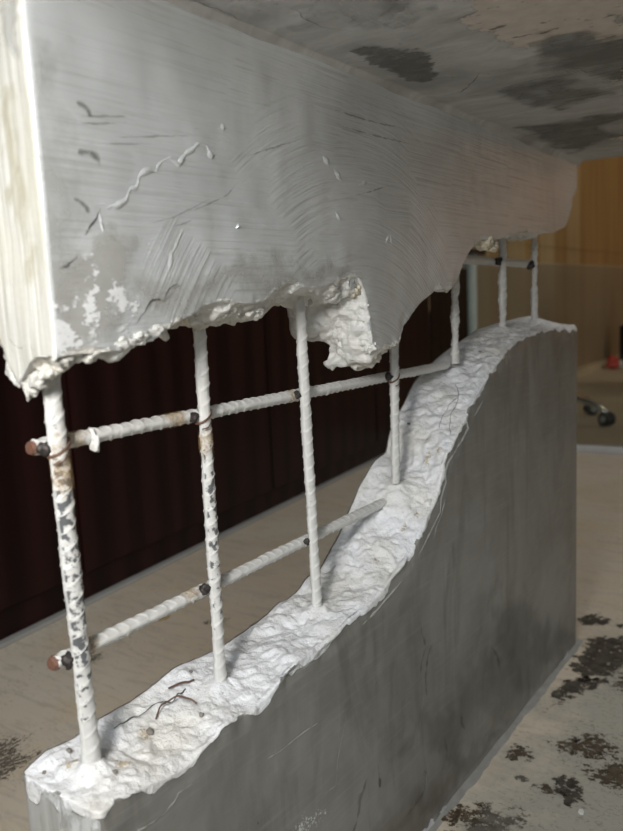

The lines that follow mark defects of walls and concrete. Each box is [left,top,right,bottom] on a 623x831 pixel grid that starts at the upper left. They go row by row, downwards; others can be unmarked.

water stain [350,47,437,82]
water stain [521,114,623,149]
peeling [5,248,174,402]
peeling [35,783,98,831]